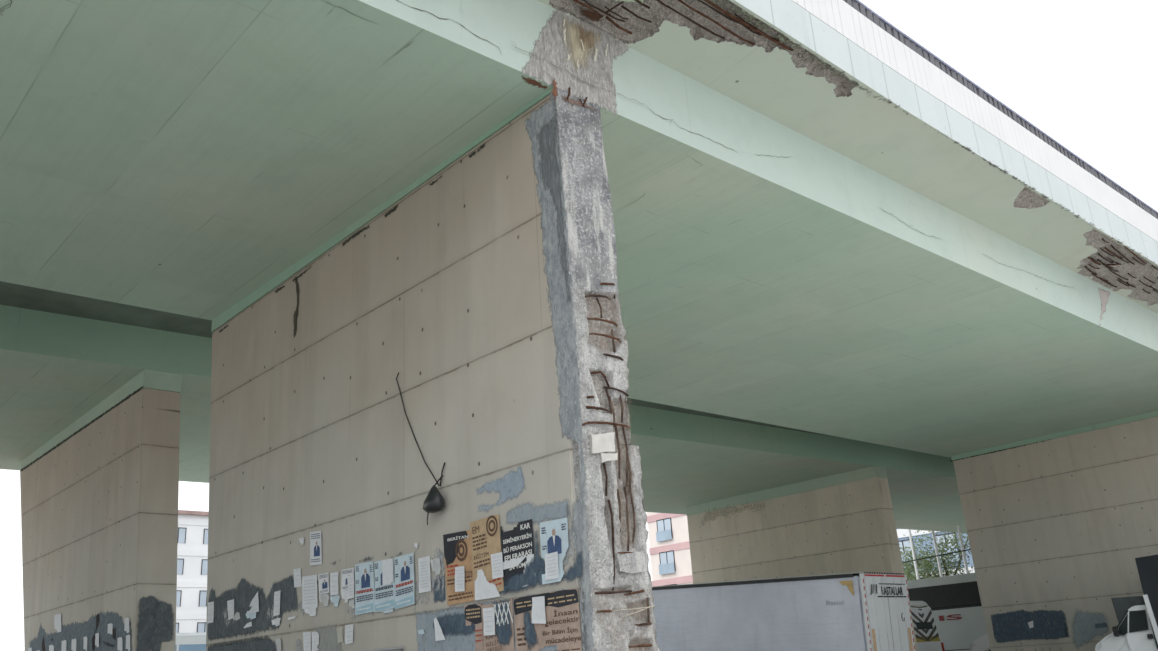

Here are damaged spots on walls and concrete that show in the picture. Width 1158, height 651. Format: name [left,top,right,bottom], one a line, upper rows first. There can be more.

corrosion [567,9,603,66]
crack [397,0,792,167]
spalling [1013,186,1050,209]
spalling [1077,229,1158,306]
spalling [522,0,858,651]